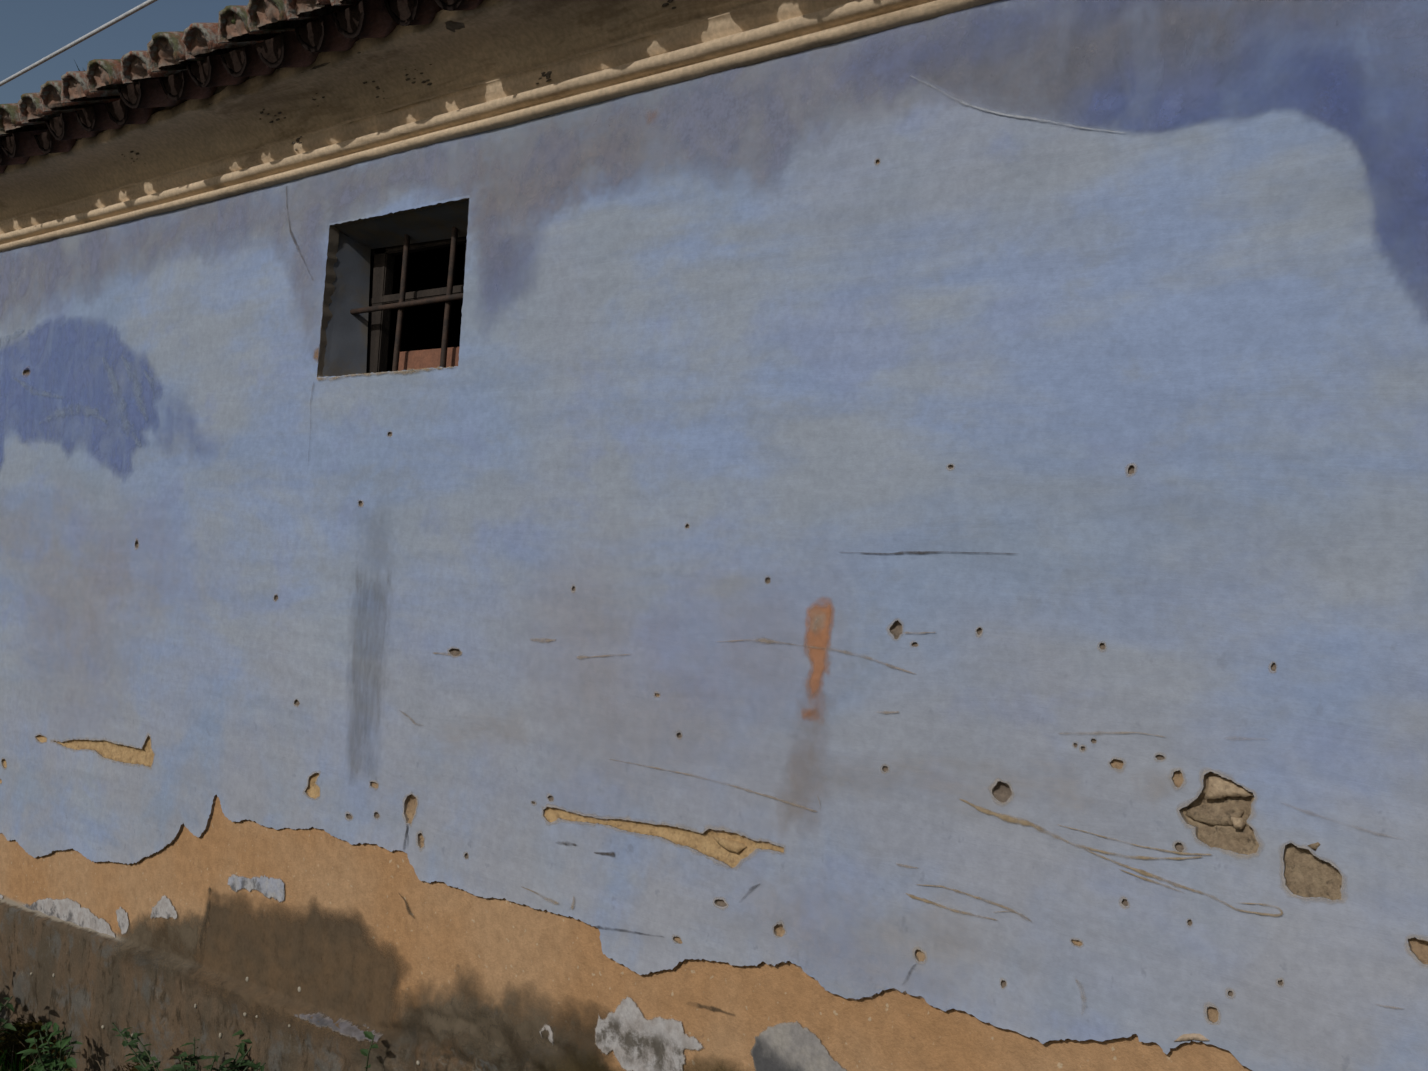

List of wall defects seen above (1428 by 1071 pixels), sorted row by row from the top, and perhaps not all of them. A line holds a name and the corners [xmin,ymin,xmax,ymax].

rust [806,604,832,694]
flaking render [35,734,155,768]
flaking render [403,793,424,848]
flaking render [1156,754,1261,857]
flaking render [1281,842,1344,902]
flaking render [775,922,786,937]
flaking render [1408,937,1428,964]
flaking render [1206,1005,1220,1023]